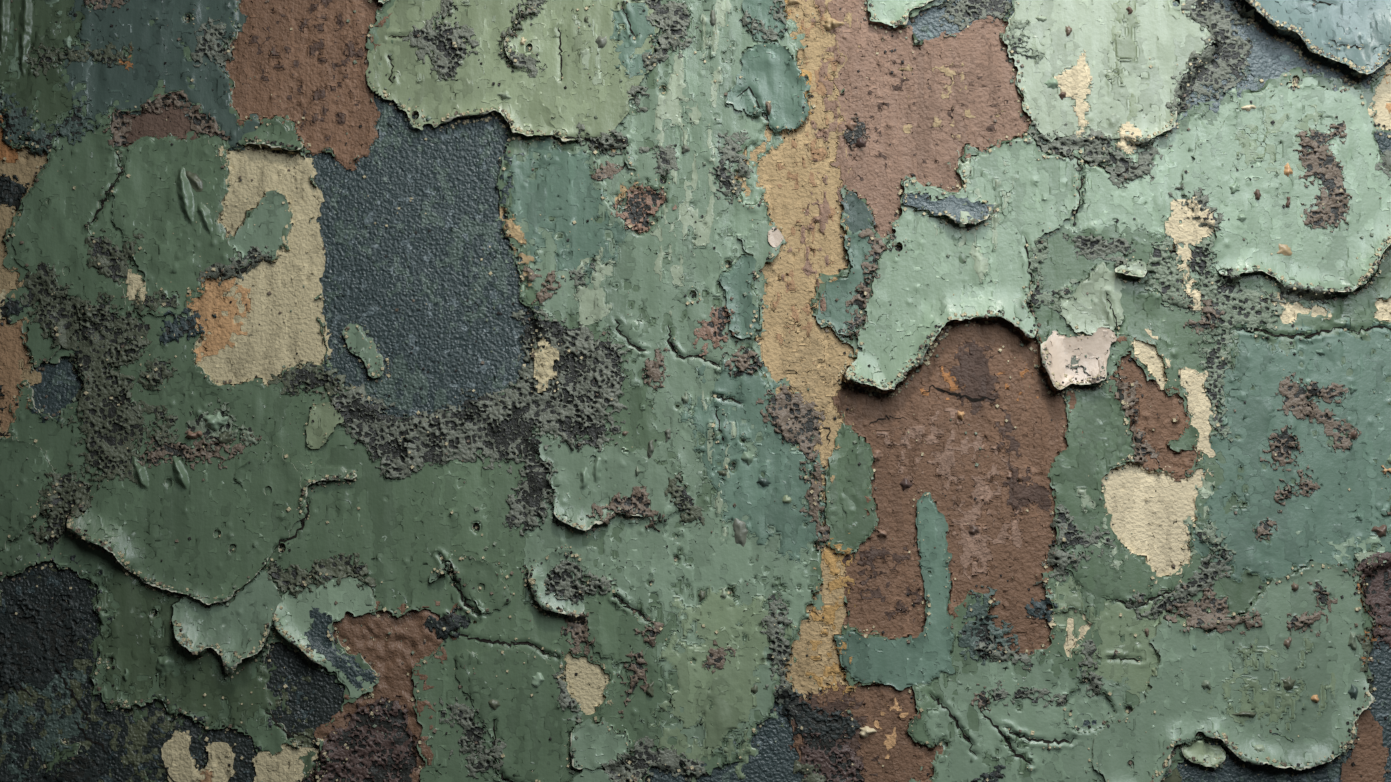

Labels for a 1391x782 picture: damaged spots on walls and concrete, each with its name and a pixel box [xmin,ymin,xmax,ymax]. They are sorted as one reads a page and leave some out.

spalling [0,0,701,782]
spalling [455,0,1391,782]